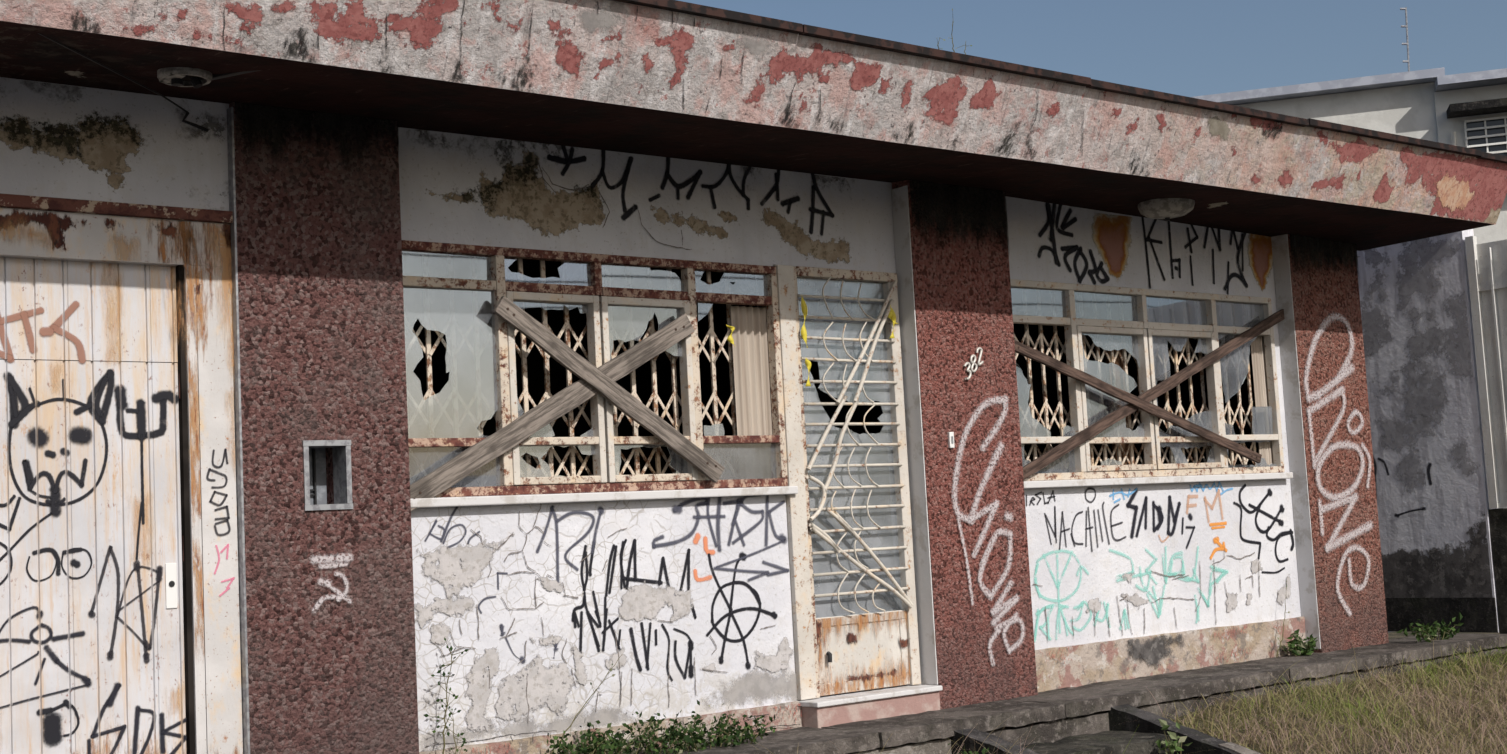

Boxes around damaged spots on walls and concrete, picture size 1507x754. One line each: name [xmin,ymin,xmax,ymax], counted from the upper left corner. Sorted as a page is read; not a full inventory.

peeling [123,0,524,50]
peeling [547,15,622,80]
peeling [743,42,1002,125]
peeling [1373,146,1507,224]
rust [0,209,87,250]
rust [150,219,234,516]
rust [192,542,204,637]
peeling [462,635,588,754]
crack [426,506,728,747]
crack [746,706,802,731]
rust [816,611,911,696]
water stain [1381,512,1493,598]